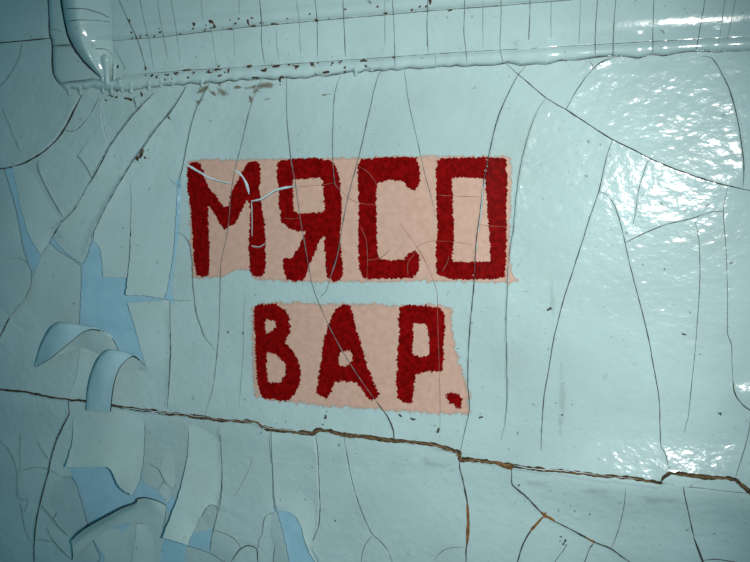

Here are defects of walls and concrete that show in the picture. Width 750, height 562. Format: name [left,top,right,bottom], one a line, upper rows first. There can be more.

crack [0,0,109,85]
corrosion [252,64,299,88]
crack [113,0,570,75]
crack [542,0,705,72]
crack [0,71,353,281]
crack [112,37,750,562]
peeling [0,165,240,562]
crack [0,388,86,560]
peeling [270,487,319,562]